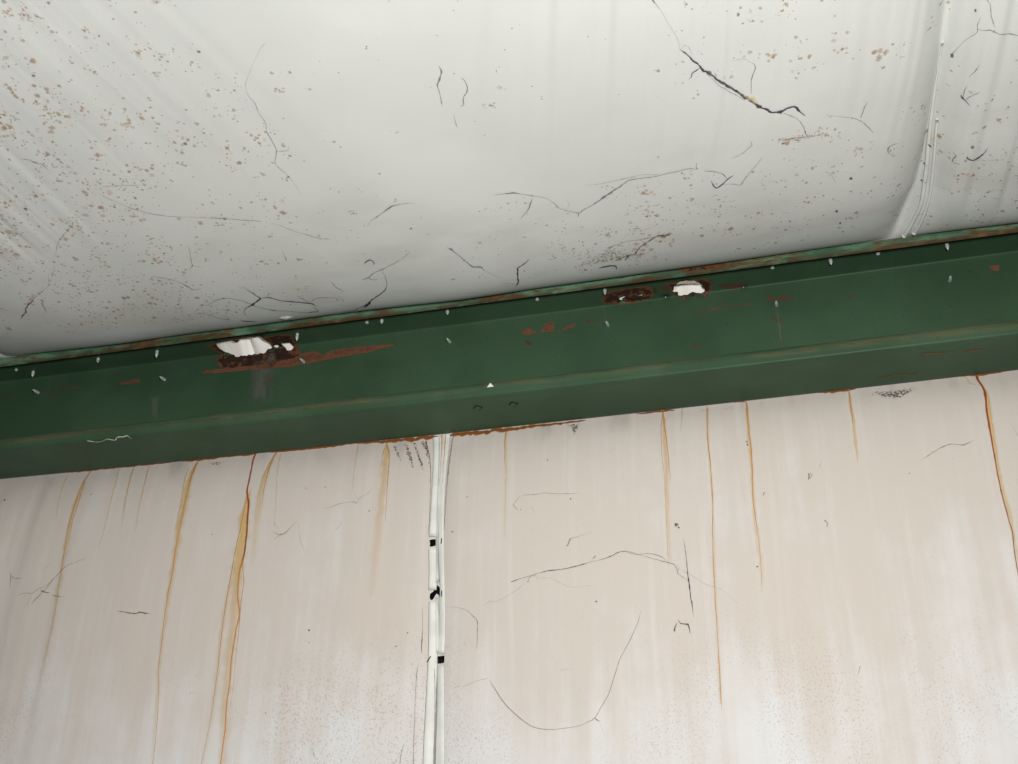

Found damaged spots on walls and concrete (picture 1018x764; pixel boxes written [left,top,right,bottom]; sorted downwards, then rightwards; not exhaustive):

crack [681,47,807,135]
crack [565,177,649,216]
crack [158,256,318,322]
crack [355,261,398,310]
crack [600,234,671,269]
rust [202,326,394,374]
rust [734,400,756,519]
rust [957,370,1018,572]
rust [63,420,585,764]
crack [511,540,693,631]